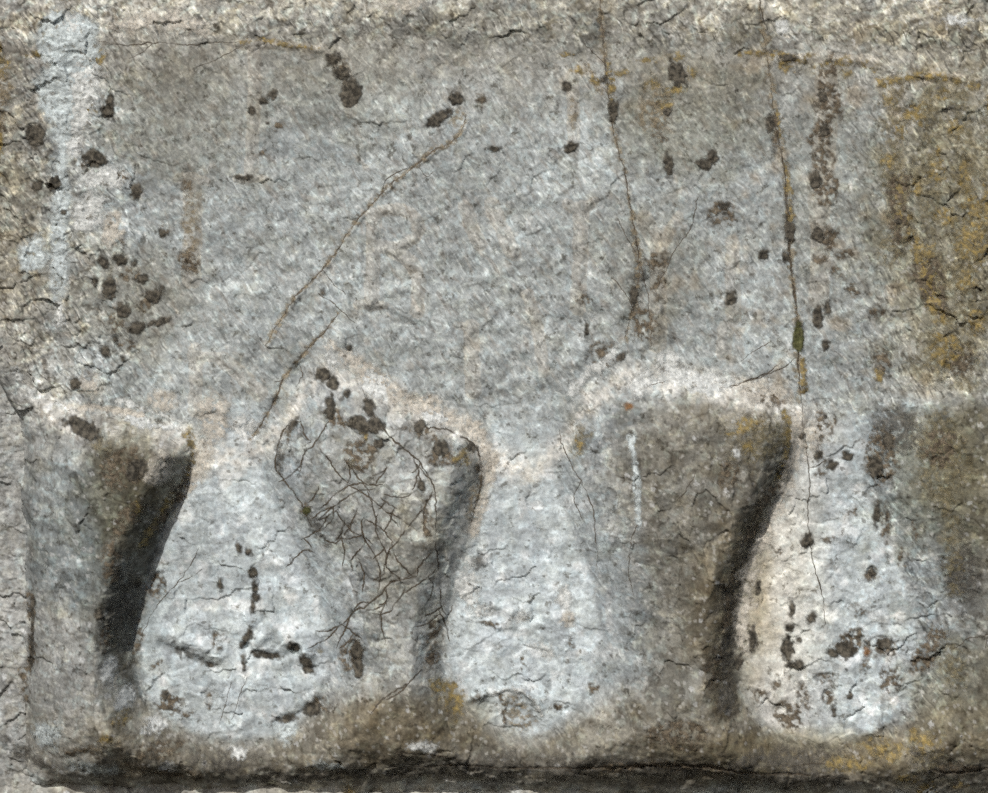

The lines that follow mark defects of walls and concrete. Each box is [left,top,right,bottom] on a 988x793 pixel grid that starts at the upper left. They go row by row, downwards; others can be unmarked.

crack [249,116,466,648]
crack [371,669,422,713]
crack [425,427,482,523]
crack [583,0,698,341]
crack [727,0,824,522]
crack [810,546,826,624]